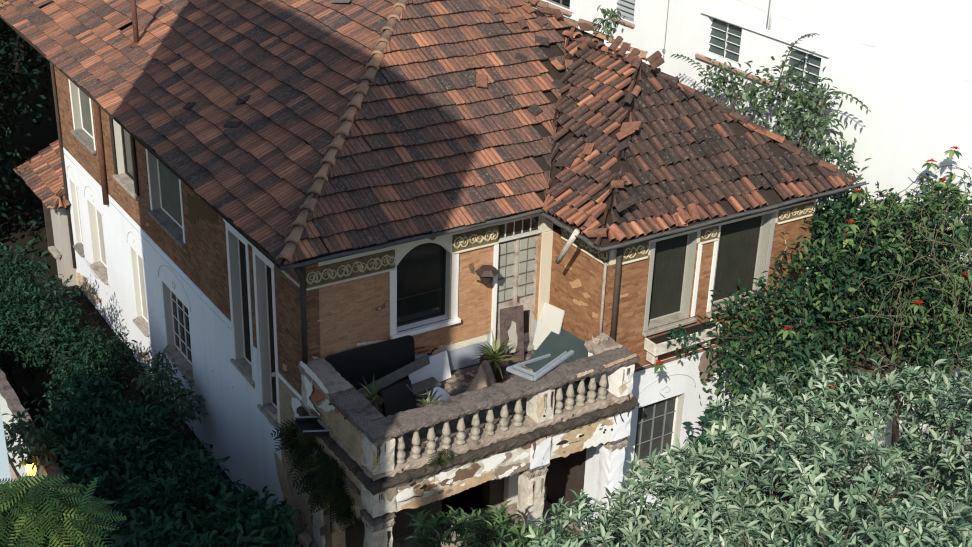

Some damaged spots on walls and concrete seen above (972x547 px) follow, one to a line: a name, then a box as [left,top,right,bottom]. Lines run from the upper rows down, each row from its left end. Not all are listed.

peeling [292,361,352,425]
spalling [552,418,628,457]
spalling [396,452,531,509]